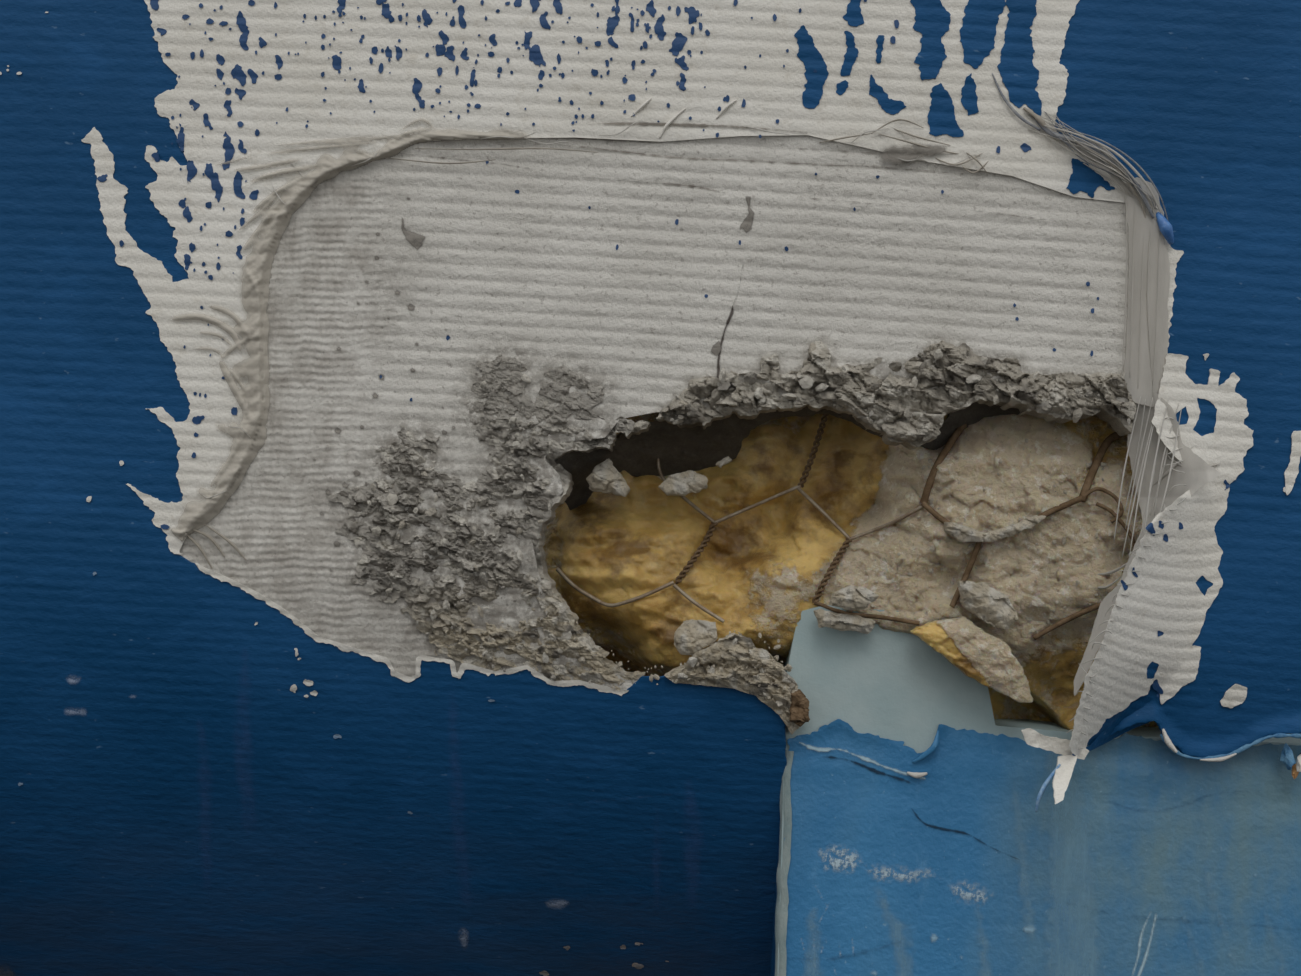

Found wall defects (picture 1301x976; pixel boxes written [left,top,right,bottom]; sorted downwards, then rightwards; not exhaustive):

flaking render [81,0,1136,783]
peeling [1220,684,1247,708]